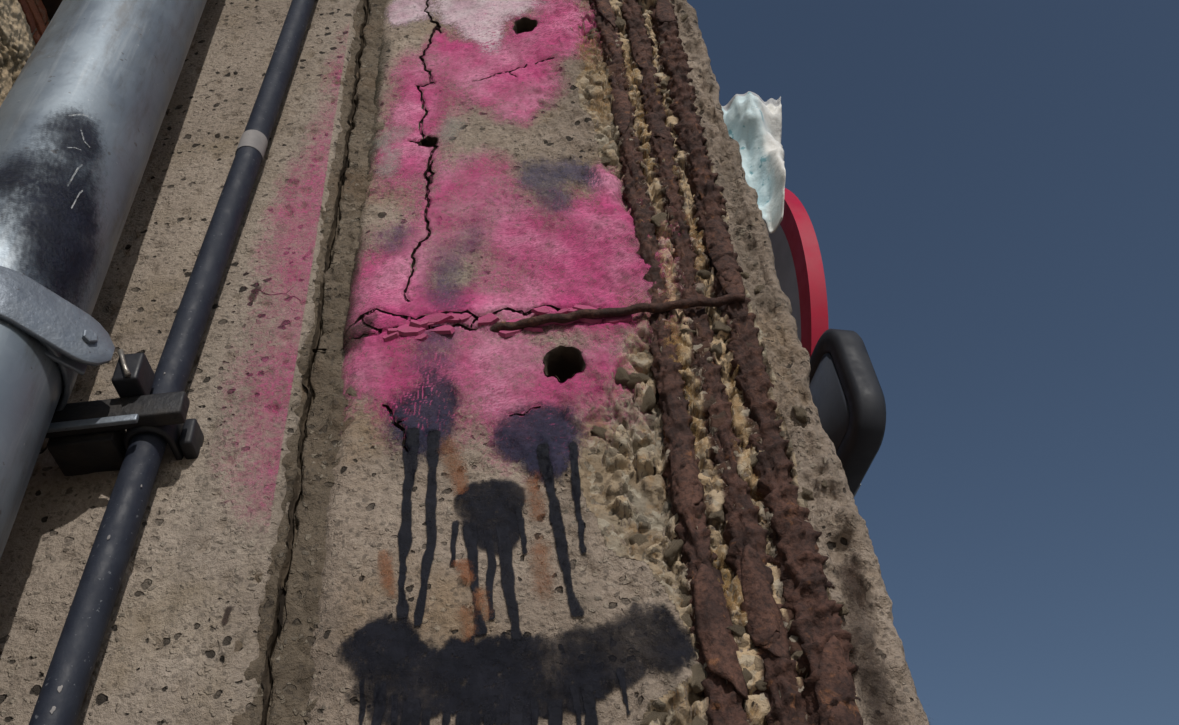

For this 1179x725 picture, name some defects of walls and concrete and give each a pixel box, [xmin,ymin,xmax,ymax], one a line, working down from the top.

rust [596,0,655,174]
crack [260,0,633,725]
spalling [570,0,828,725]
rust [694,544,791,700]
rust [815,635,863,725]